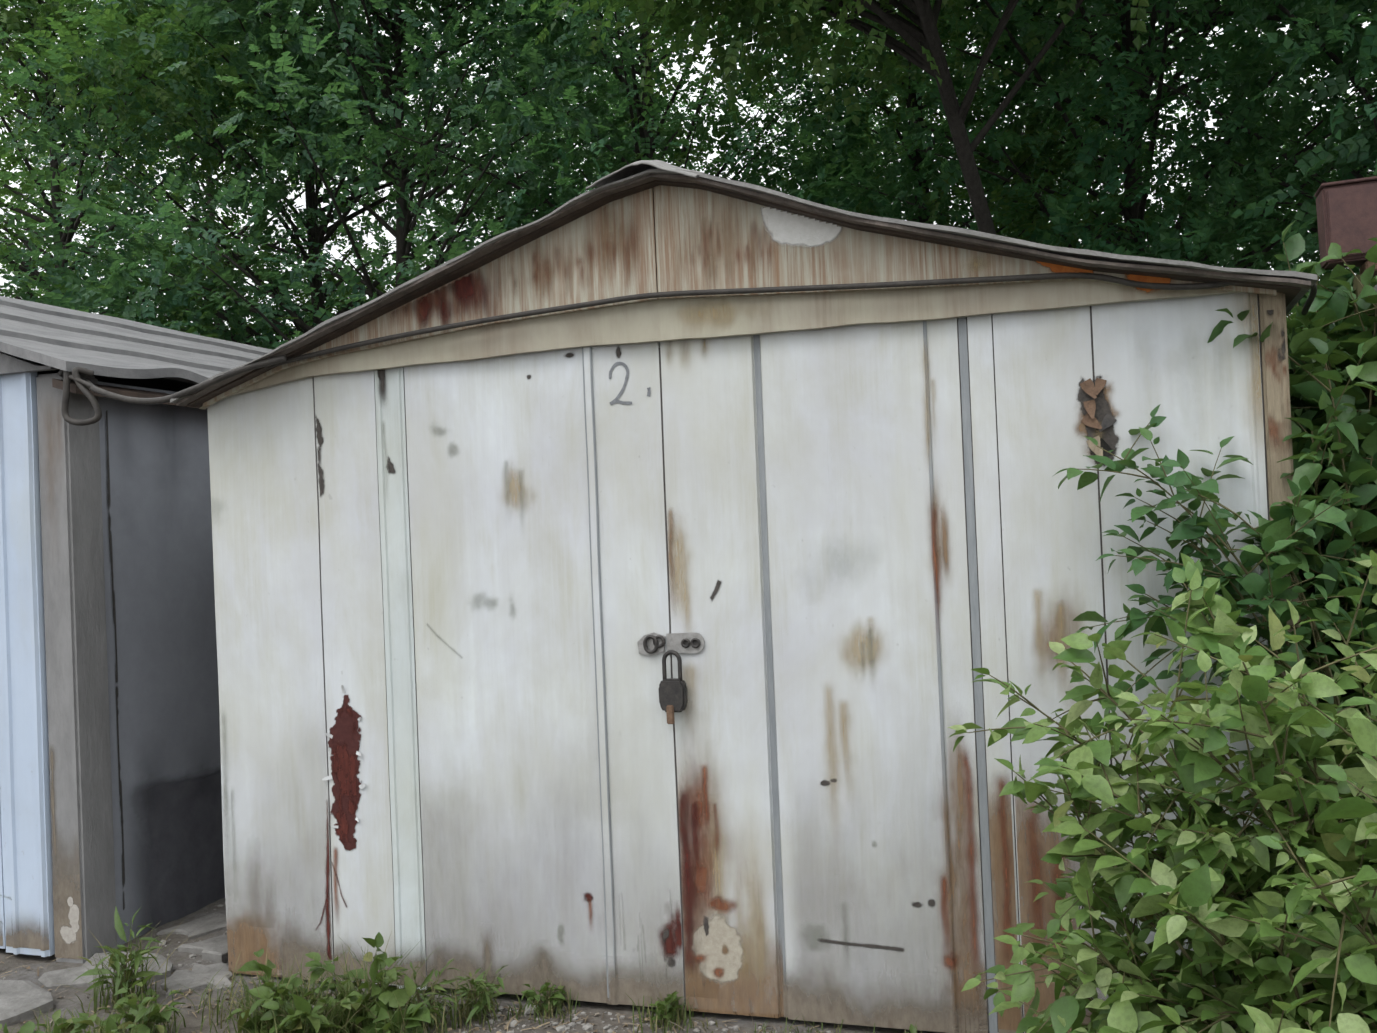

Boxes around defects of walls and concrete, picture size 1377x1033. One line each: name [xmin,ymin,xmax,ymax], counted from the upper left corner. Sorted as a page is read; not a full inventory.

peeling [761,207,841,246]
rust [405,273,488,324]
peeling [1080,378,1117,457]
rust [932,502,948,600]
spalling [60,897,79,944]
peeling [692,914,743,983]
rust [660,766,784,1018]
rust [942,747,1079,1033]